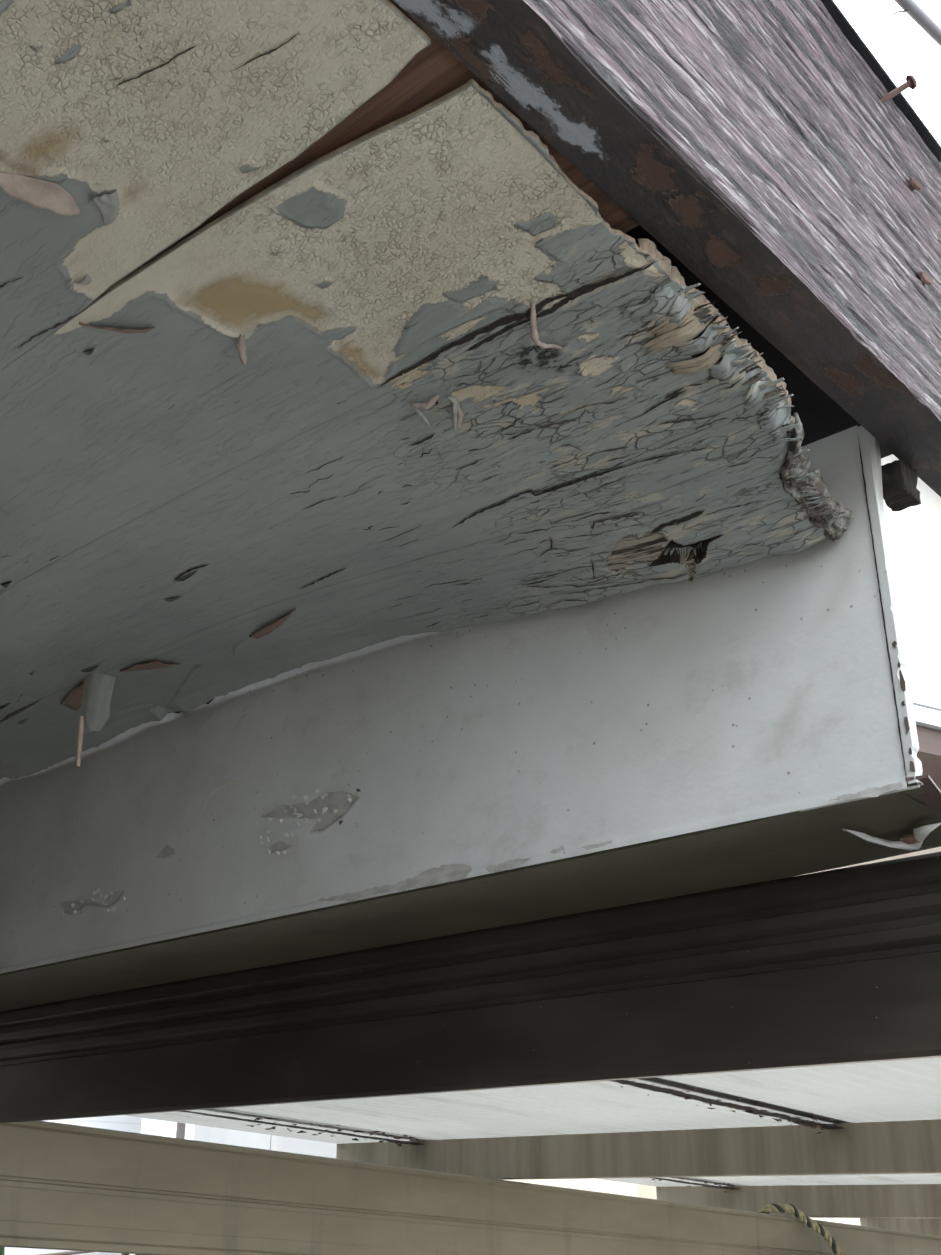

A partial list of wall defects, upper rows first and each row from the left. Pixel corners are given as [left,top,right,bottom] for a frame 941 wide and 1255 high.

crack [114,44,199,88]
crack [229,34,297,72]
peeling [0,0,608,390]
peeling [629,143,750,268]
crack [380,259,667,387]
peeling [578,333,638,395]
peeling [619,241,766,406]
crack [687,302,719,340]
crack [291,457,482,627]
crack [452,370,765,609]
peeling [605,533,668,572]
peeling [256,789,363,855]